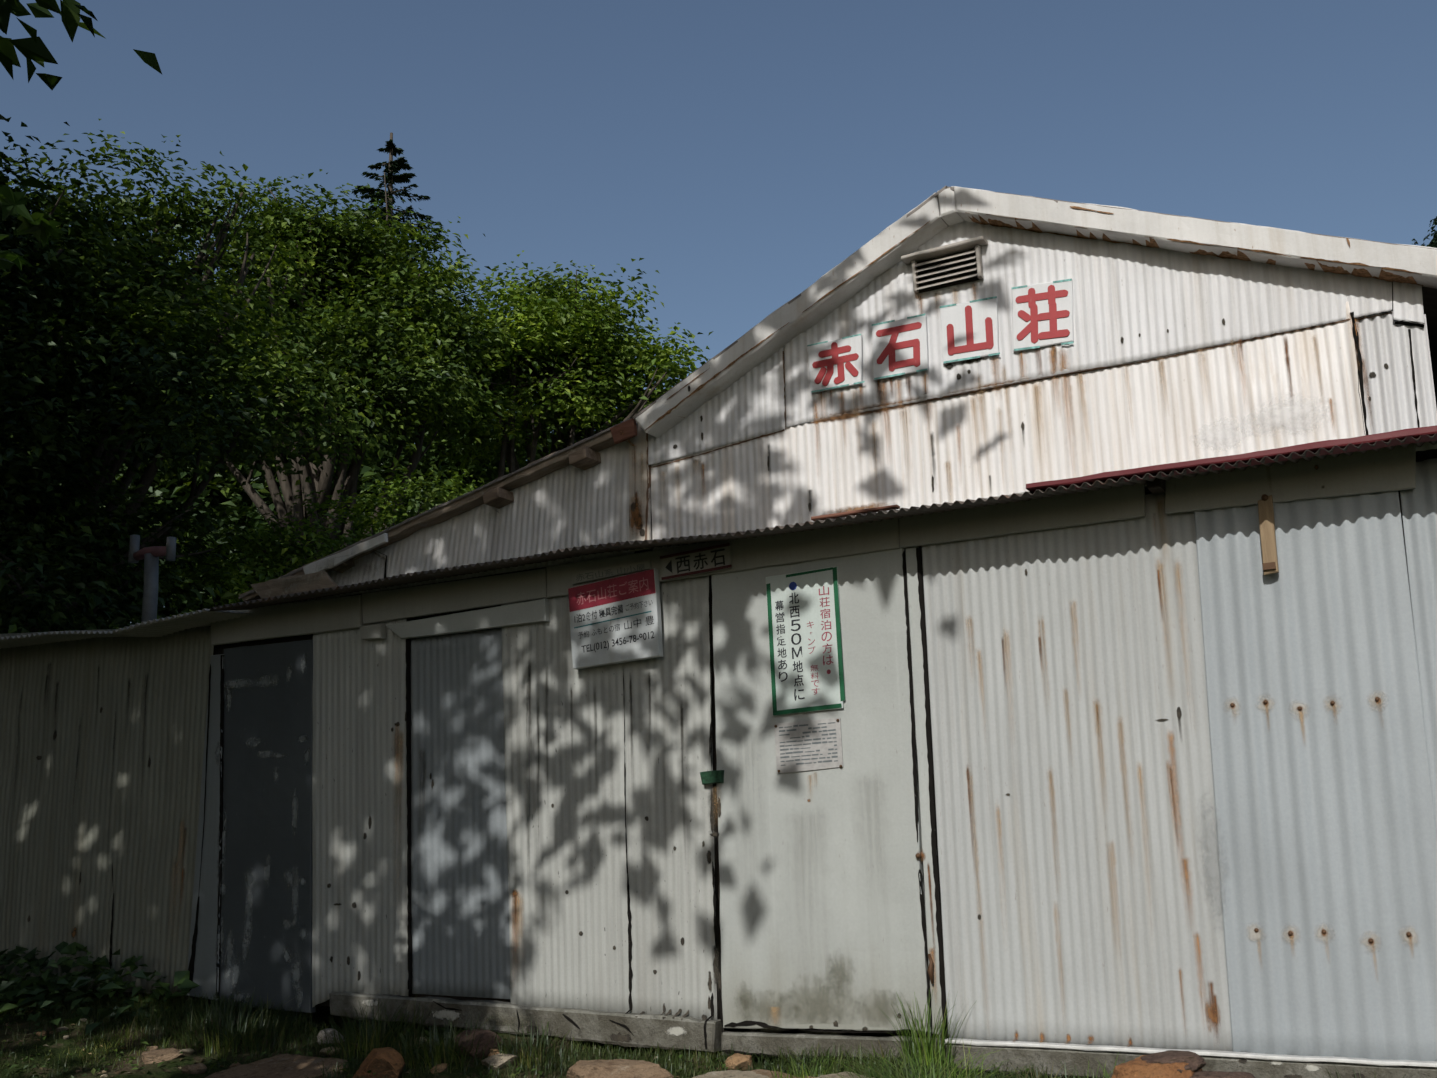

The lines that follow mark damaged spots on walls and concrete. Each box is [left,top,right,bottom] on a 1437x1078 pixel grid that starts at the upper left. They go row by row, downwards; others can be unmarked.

corrosion [965,212,1423,286]
corrosion [815,374,927,444]
corrosion [971,345,1082,407]
corrosion [629,492,645,536]
peeling [216,863,306,1005]
corrosion [1206,983,1218,1024]